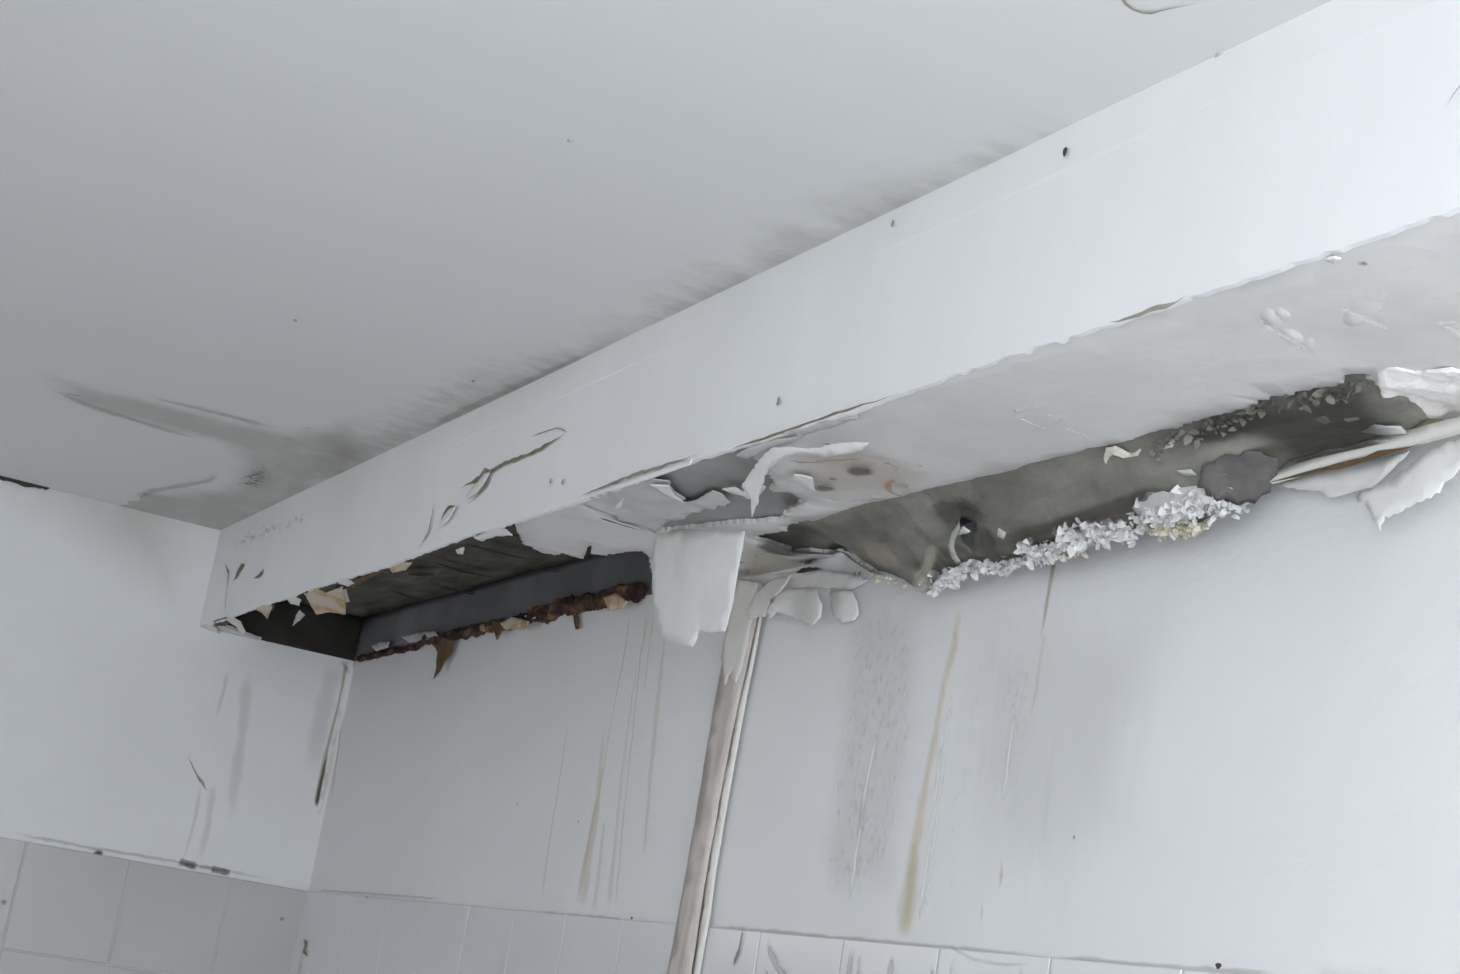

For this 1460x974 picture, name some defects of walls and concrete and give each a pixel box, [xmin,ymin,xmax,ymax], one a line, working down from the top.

damp [793,559,820,573]
spalling [200,374,1428,661]
corrosion [353,581,648,679]